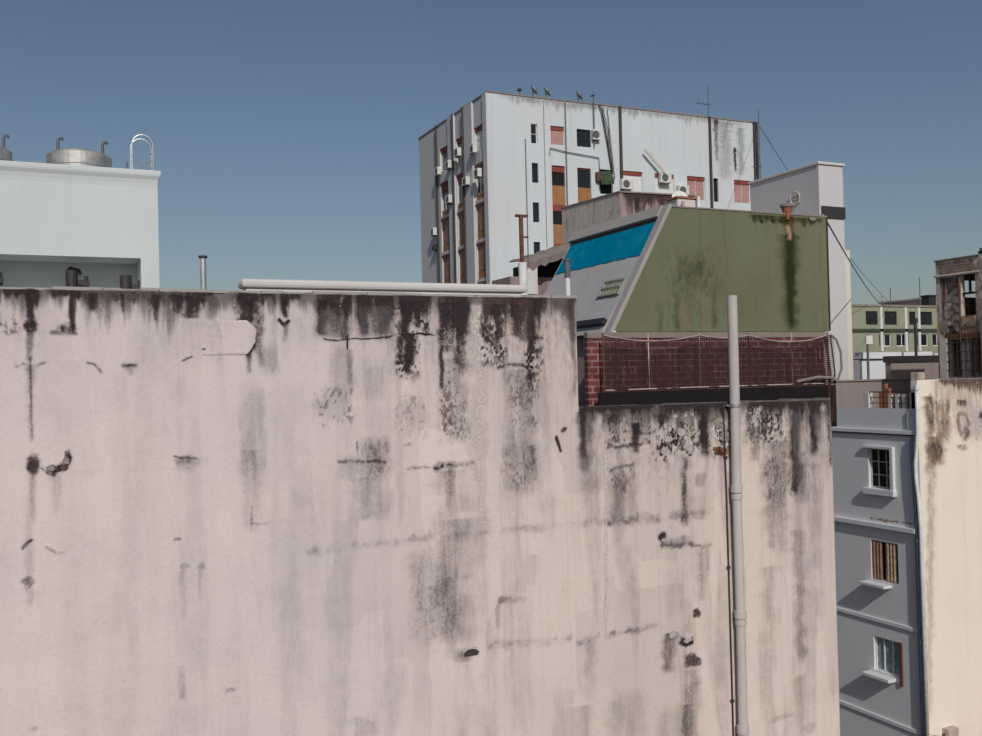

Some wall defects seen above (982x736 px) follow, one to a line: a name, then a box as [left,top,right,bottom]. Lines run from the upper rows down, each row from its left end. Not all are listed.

water stain [0,289,215,396]
water stain [235,293,300,361]
water stain [784,223,796,325]
water stain [937,276,959,322]
water stain [317,294,576,531]
water stain [746,400,832,493]
water stain [924,396,934,460]
peeling [928,400,982,462]
water stain [577,402,730,629]